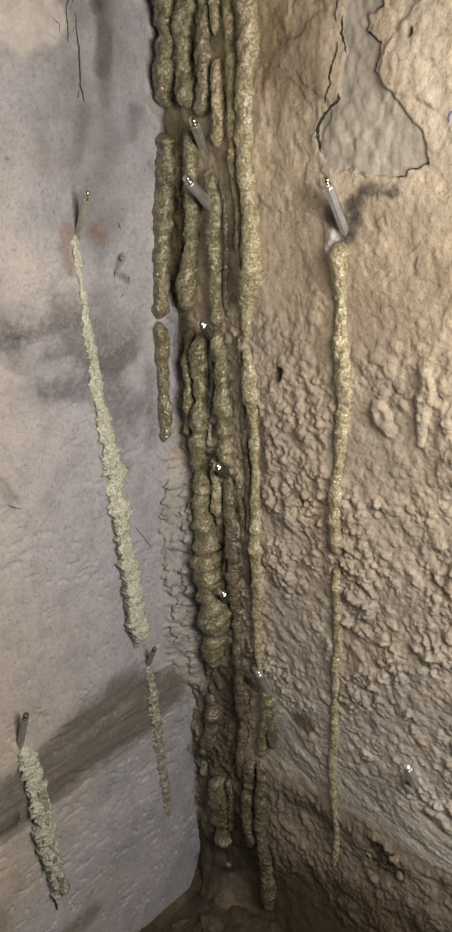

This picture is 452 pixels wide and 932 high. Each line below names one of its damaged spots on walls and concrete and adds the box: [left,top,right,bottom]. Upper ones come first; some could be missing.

crack [52,0,85,103]
peeling [316,0,429,178]
damp [93,325,152,424]